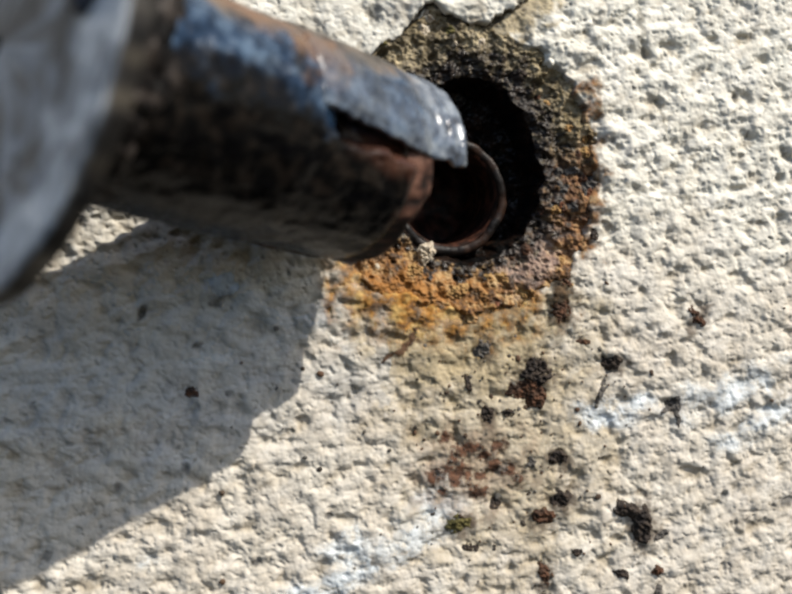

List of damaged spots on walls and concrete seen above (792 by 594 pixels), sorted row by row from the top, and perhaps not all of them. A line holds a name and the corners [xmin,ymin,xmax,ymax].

corrosion [325,147,574,410]
spalling [354,0,597,324]
corrosion [480,405,515,428]